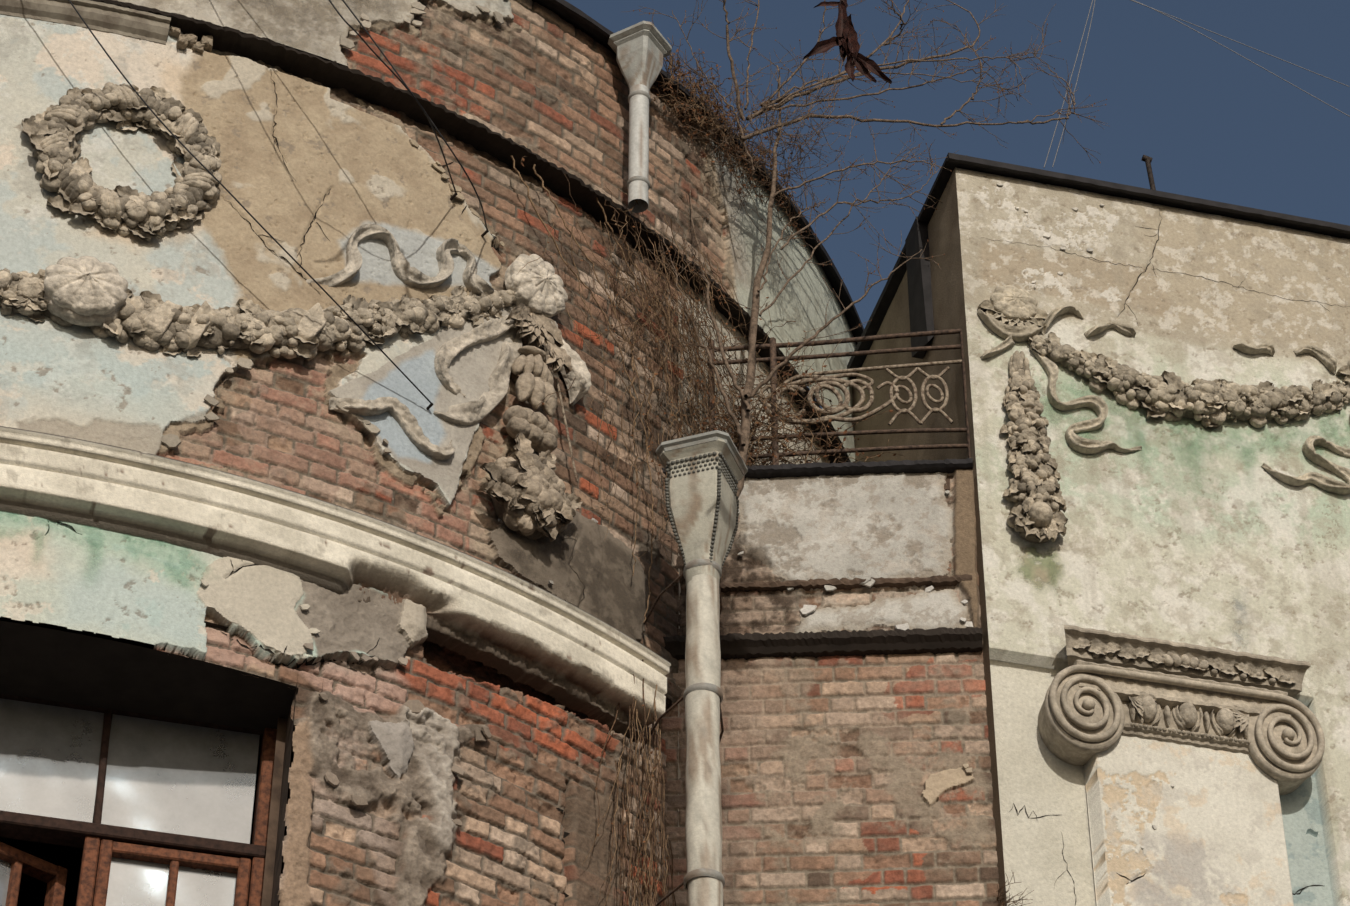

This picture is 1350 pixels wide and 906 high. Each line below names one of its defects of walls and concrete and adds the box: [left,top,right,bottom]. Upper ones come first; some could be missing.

crack [270,69,296,181]
flaking render [340,0,737,302]
crack [225,191,330,294]
crack [983,209,1350,320]
flaking render [156,87,699,708]
flaking render [737,472,973,633]
flaking render [278,599,667,906]
crack [1009,803,1076,905]
peeling [1097,767,1154,904]